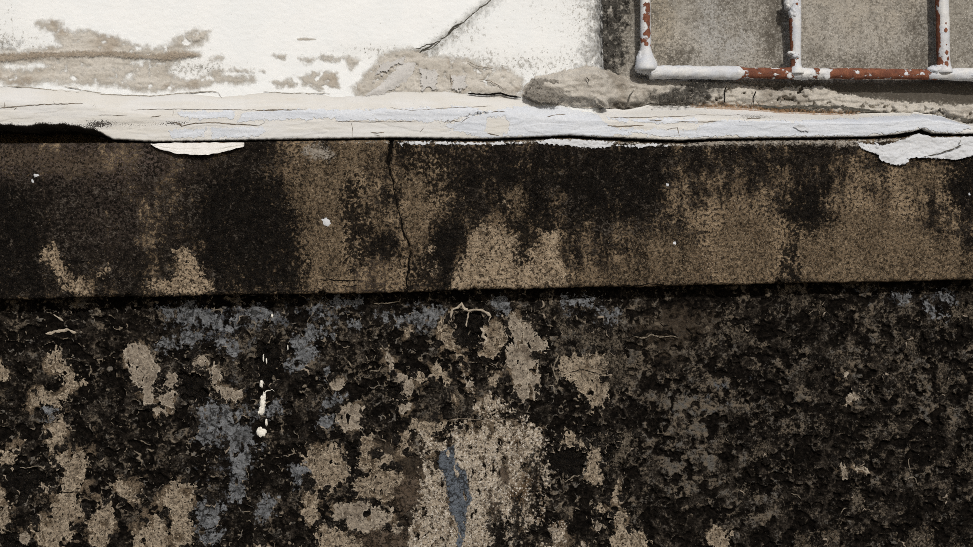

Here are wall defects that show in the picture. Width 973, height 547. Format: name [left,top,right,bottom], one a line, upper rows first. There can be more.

crack [416,0,491,53]
corrosion [640,2,651,46]
corrosion [736,18,796,81]
corrosion [813,0,944,80]
peeling [151,105,973,165]
water stain [187,167,312,295]
crack [2,61,973,295]
water stain [335,138,670,293]
water stain [774,177,838,284]
water stain [939,156,973,210]
water stain [461,368,516,416]
water stain [477,442,570,547]